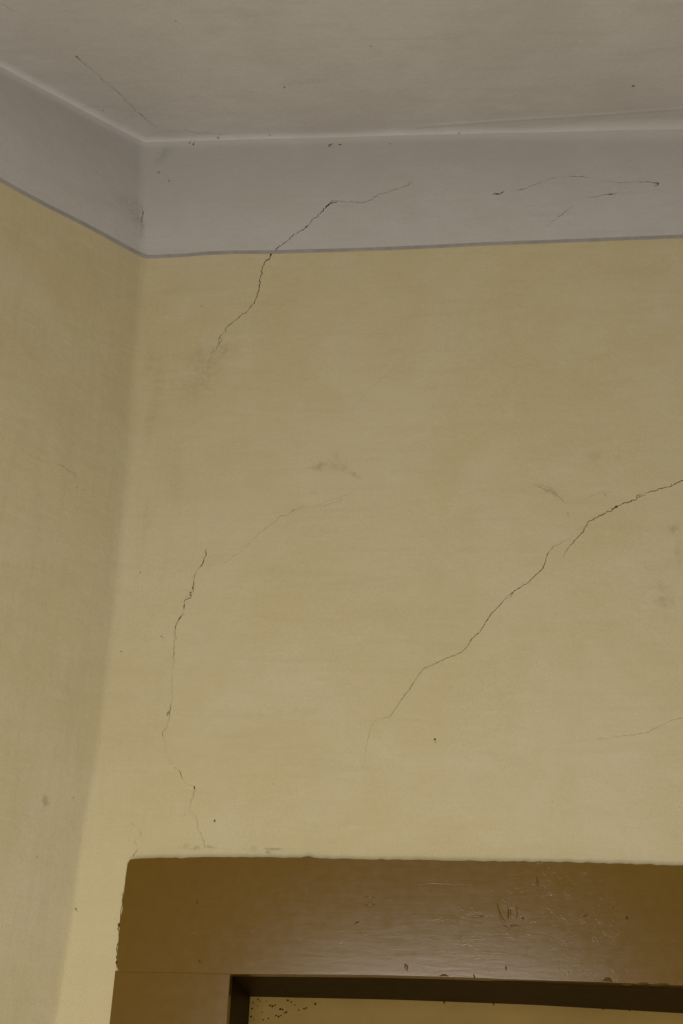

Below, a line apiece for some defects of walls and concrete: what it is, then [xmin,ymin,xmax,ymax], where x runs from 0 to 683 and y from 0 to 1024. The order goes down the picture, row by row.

crack [218,185,407,345]
crack [174,550,207,632]
crack [392,480,683,713]